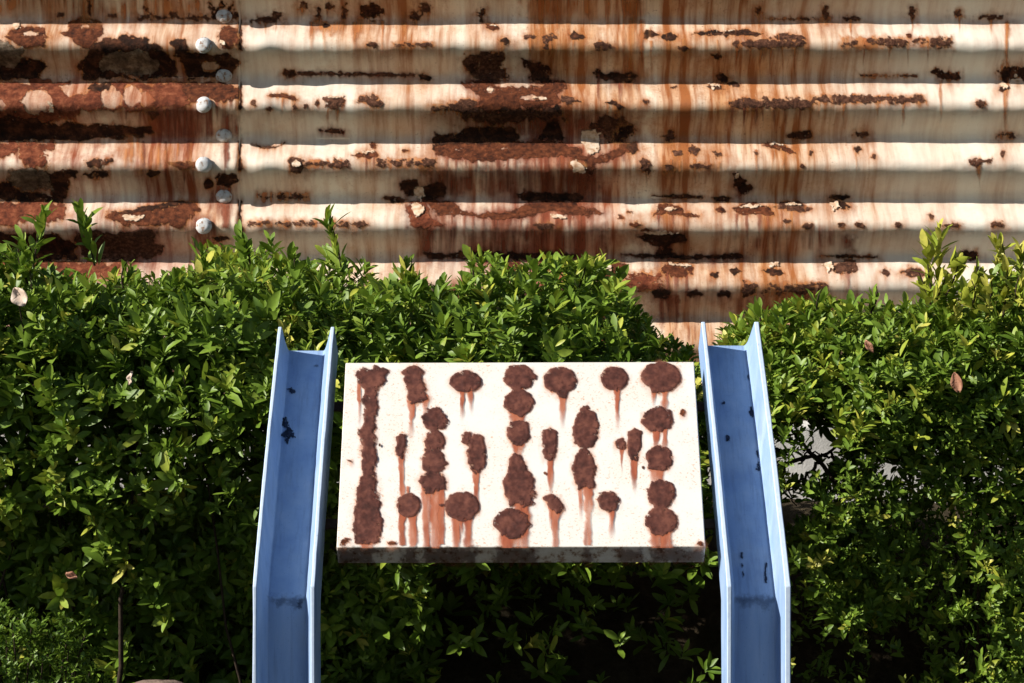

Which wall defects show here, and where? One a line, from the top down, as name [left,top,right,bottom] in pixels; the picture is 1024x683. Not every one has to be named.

rust [840,6,953,55]
rust [0,0,383,279]
rust [297,0,722,271]
rust [708,72,927,121]
rust [601,203,703,320]